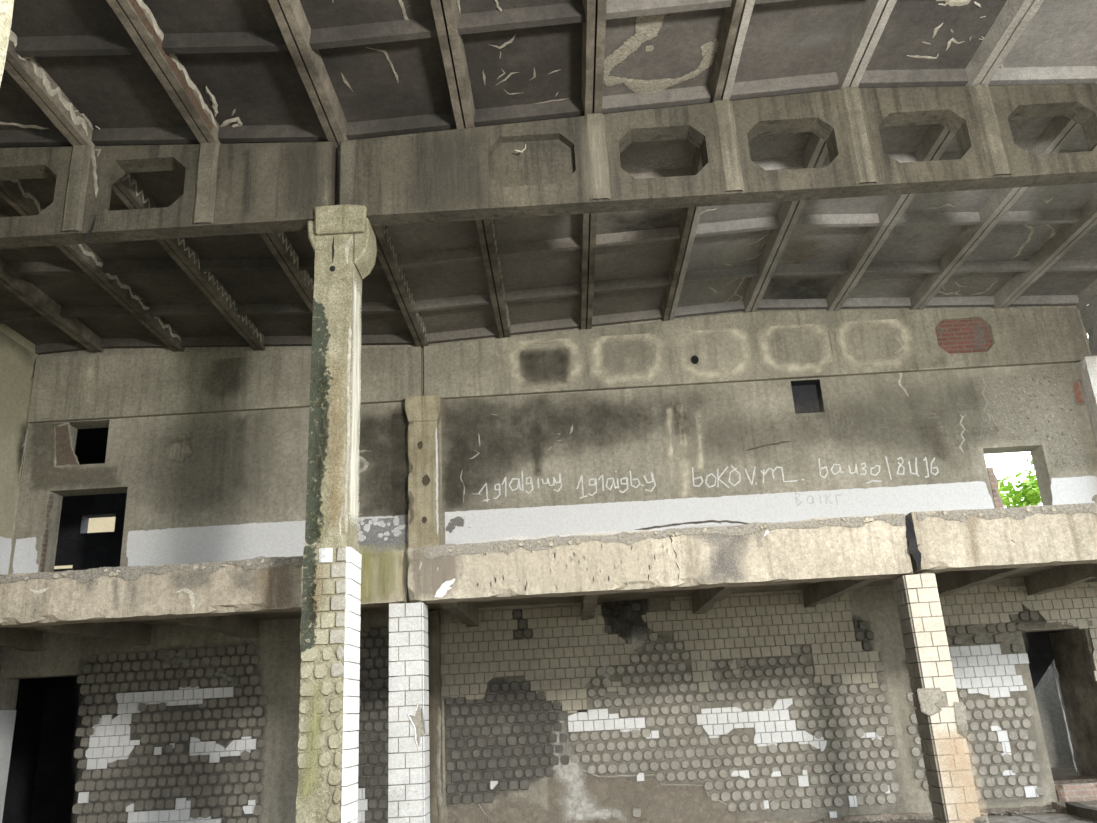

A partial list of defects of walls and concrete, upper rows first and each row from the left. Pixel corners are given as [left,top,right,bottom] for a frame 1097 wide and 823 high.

damp [278,232,333,653]
damp [338,283,409,536]
damp [442,333,704,505]
crack [402,551,410,601]
crack [905,516,921,569]
spalling [917,687,967,738]